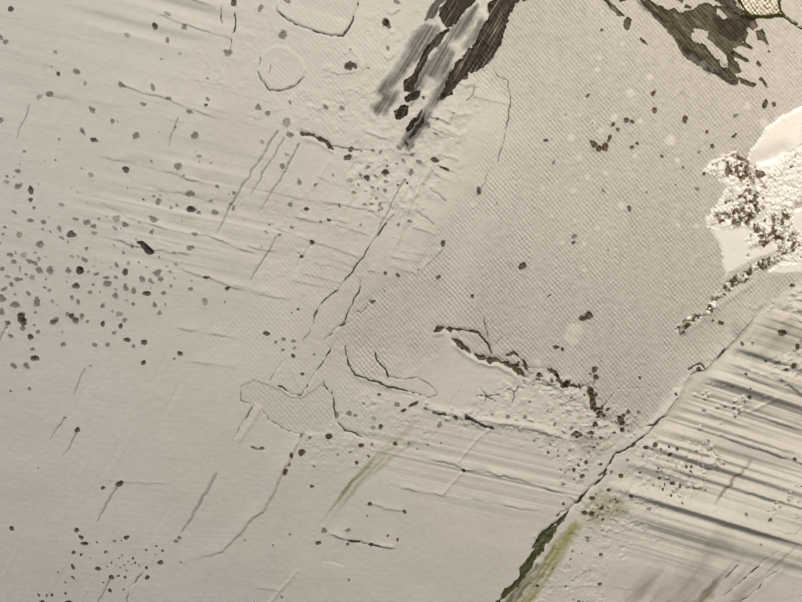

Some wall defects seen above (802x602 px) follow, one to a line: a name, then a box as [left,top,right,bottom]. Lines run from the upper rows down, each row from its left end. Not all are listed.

spalling [439,0,525,100]
peeling [640,0,770,88]
spalling [590,118,634,152]
spalling [674,106,802,334]
crack [271,215,493,437]
crack [688,348,728,375]
spalling [395,401,474,428]
crack [433,321,675,602]
crack [724,555,783,601]